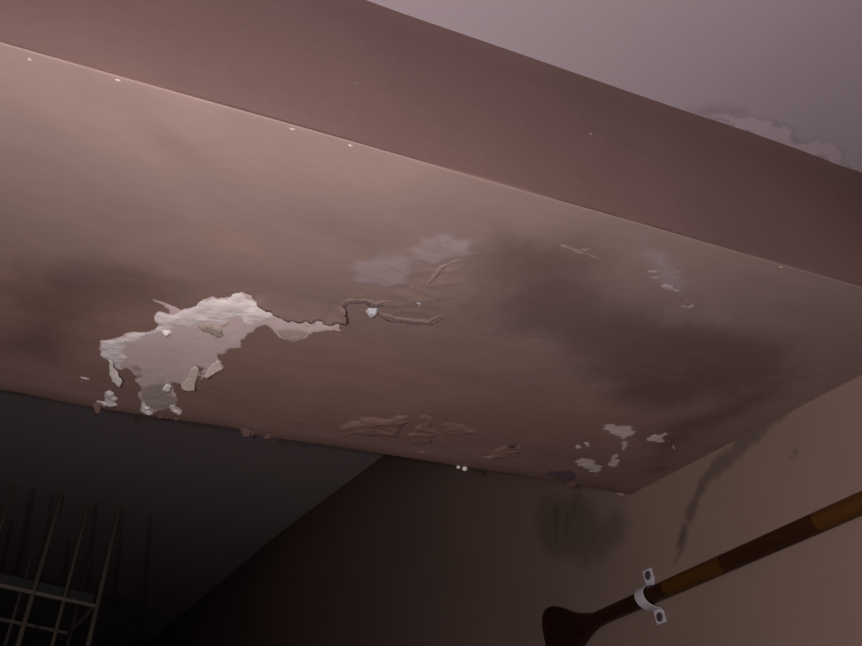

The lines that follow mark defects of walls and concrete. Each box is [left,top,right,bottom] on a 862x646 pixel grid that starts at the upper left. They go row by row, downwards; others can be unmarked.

peeling [92,292,348,416]
leakage [547,424,636,482]
leakage [646,433,676,449]